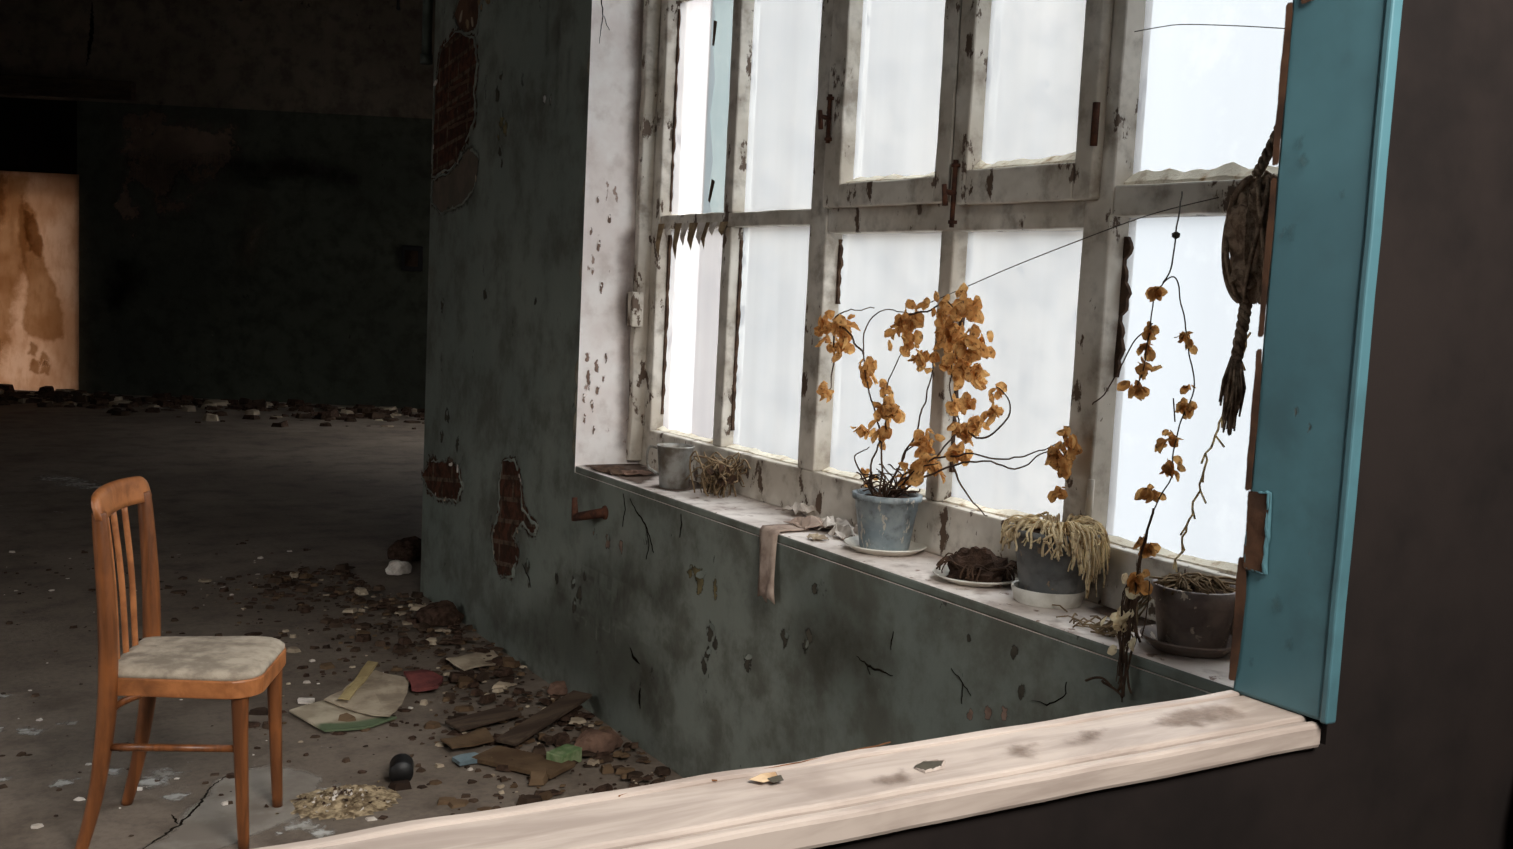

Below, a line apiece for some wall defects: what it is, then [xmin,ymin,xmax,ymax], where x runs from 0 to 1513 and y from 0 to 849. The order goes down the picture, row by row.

spalling [430,0,484,216]
spalling [421,407,464,506]
spalling [490,456,539,587]